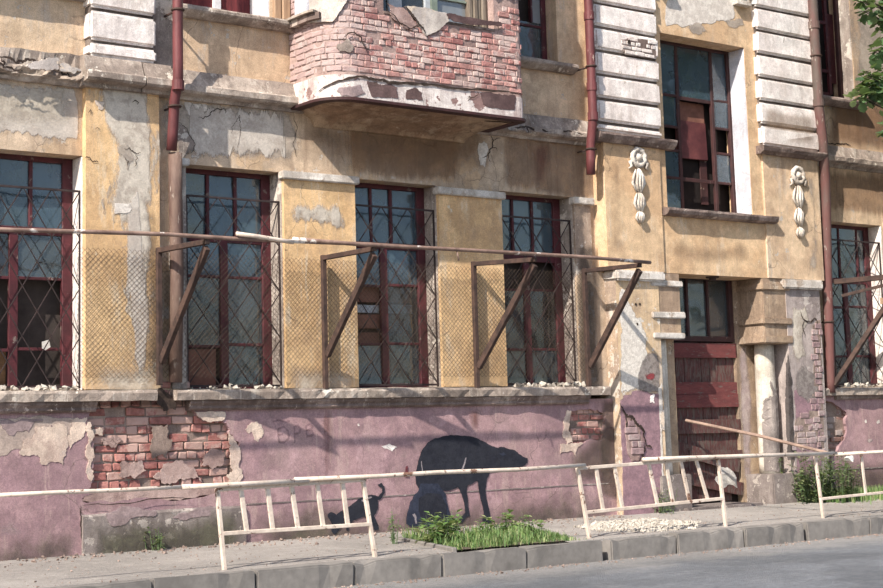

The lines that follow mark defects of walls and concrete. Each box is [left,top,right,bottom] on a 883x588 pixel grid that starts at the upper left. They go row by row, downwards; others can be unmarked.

peeling [665,0,744,35]
crack [0,56,37,72]
flaking render [621,37,657,59]
peeling [337,81,423,100]
peeling [480,92,516,110]
crack [483,121,581,161]
peeling [95,89,297,375]
flaking render [0,315,243,527]
peeling [245,421,264,442]
flaking render [560,409,603,456]
peeling [619,289,665,515]
flaking render [792,308,845,477]